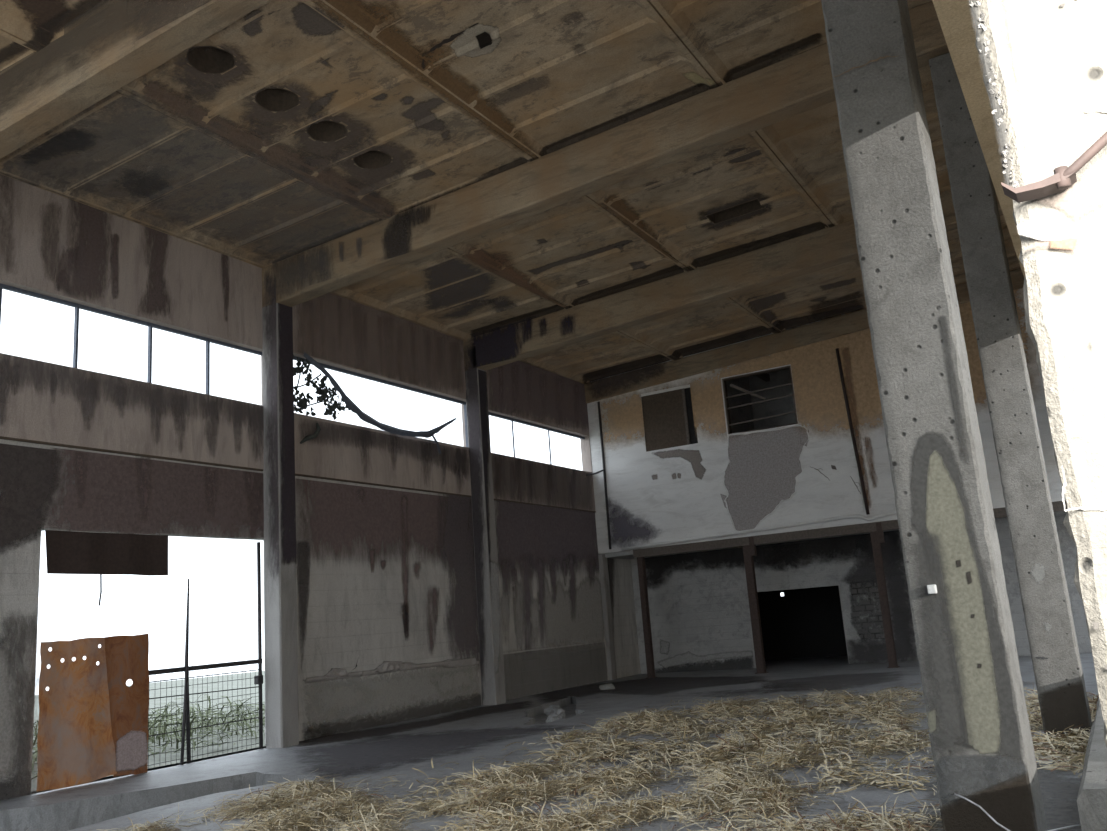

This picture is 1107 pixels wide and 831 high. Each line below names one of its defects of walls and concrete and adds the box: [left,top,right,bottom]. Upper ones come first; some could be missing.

spalling [450,24,501,57]
spalling [970,0,1019,188]
damp [43,200,119,299]
damp [142,226,170,315]
damp [0,443,59,553]
spalling [654,449,706,479]
peeling [721,424,810,535]
damp [297,542,310,658]
damp [428,494,480,665]
peeling [926,451,1000,754]
damp [0,617,40,801]
damp [299,554,898,779]